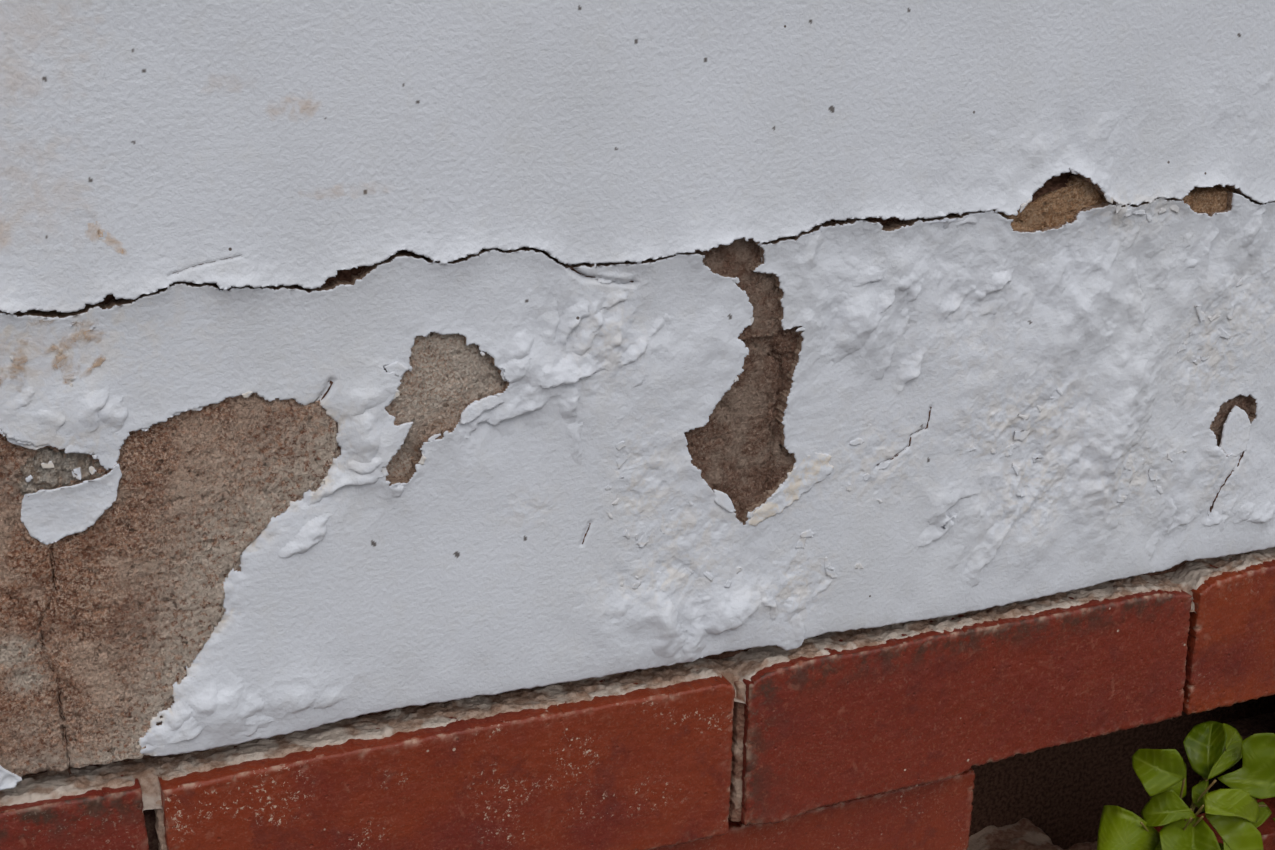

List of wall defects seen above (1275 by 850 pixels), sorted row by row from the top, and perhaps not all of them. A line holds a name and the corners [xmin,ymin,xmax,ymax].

crack [825,217,903,226]
crack [1031,172,1075,202]
peeling [997,168,1238,231]
crack [50,294,121,312]
crack [297,266,365,286]
crack [539,250,634,282]
peeling [382,332,506,478]
peeling [684,239,834,526]
peeling [1210,395,1251,457]
peeling [0,391,340,791]
crack [39,549,72,775]